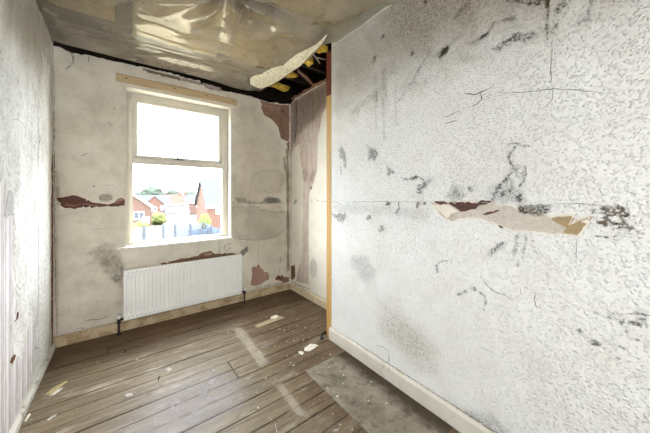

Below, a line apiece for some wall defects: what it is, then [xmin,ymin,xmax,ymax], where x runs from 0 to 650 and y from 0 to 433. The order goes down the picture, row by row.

crack [445,40,610,124]
peeling [51,152,125,346]
peeling [160,250,236,265]
peeling [250,83,327,286]
peeling [431,199,593,237]